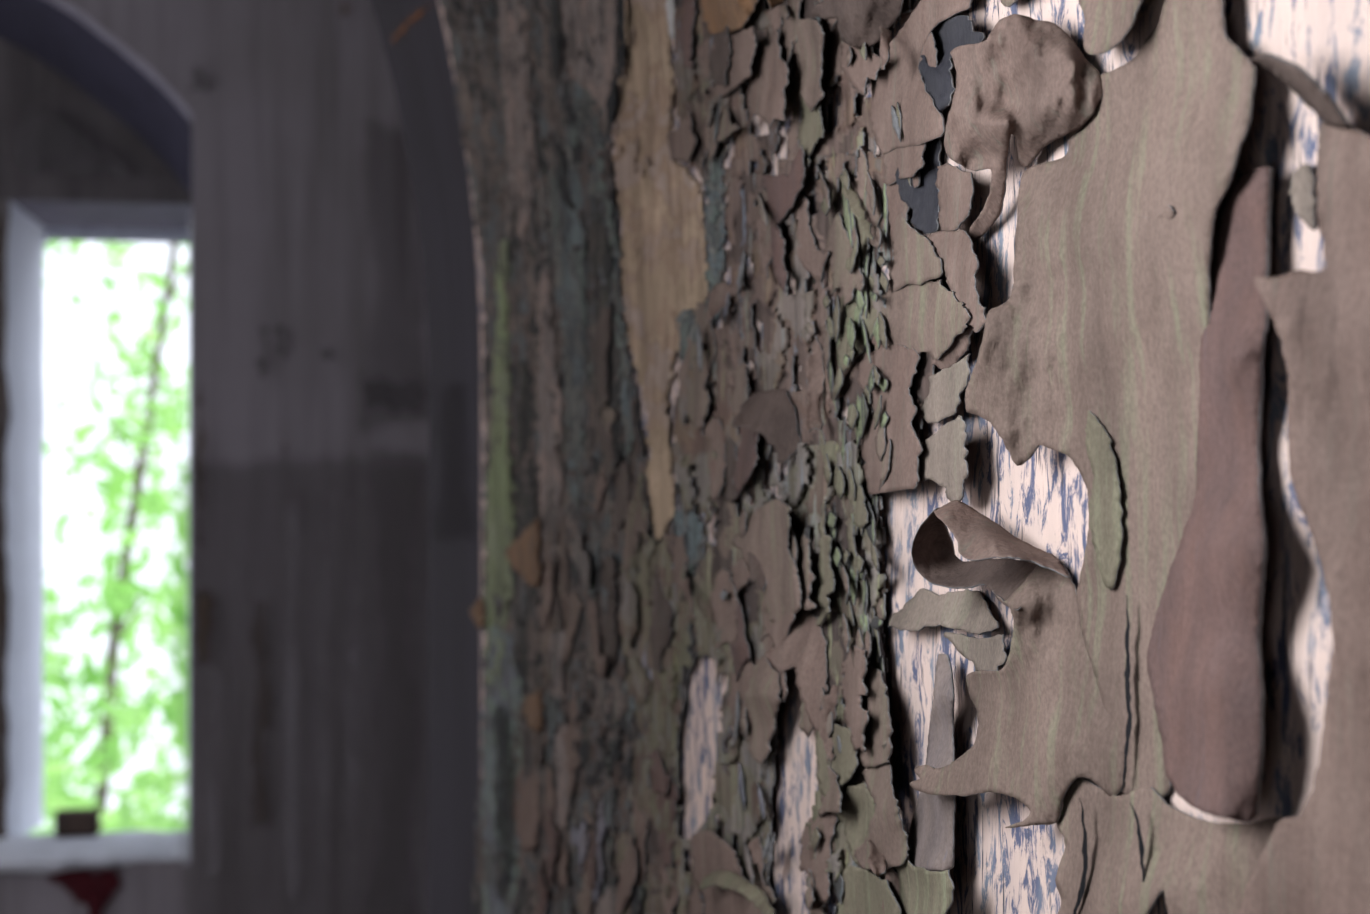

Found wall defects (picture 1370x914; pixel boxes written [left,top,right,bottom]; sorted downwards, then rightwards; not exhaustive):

peeling [440,0,1370,914]